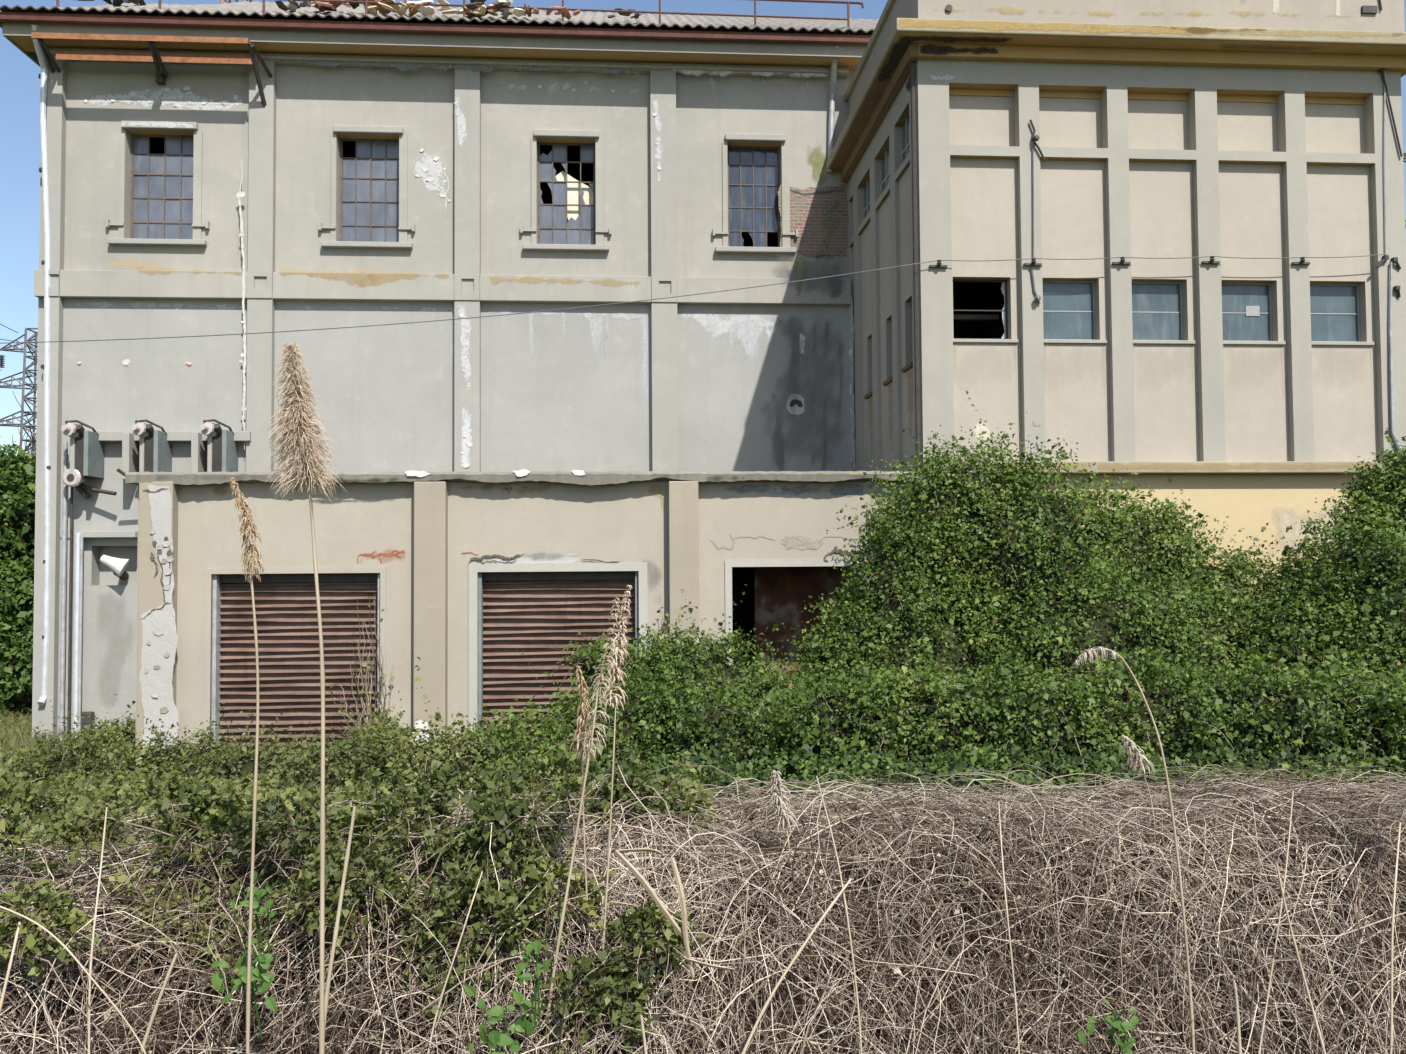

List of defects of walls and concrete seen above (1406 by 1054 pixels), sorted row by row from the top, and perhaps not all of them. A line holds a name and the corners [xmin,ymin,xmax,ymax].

peeling [413,148,451,209]
flaking render [778,174,849,258]
crack [710,534,775,550]
crack [823,536,859,559]
peeling [140,485,179,755]